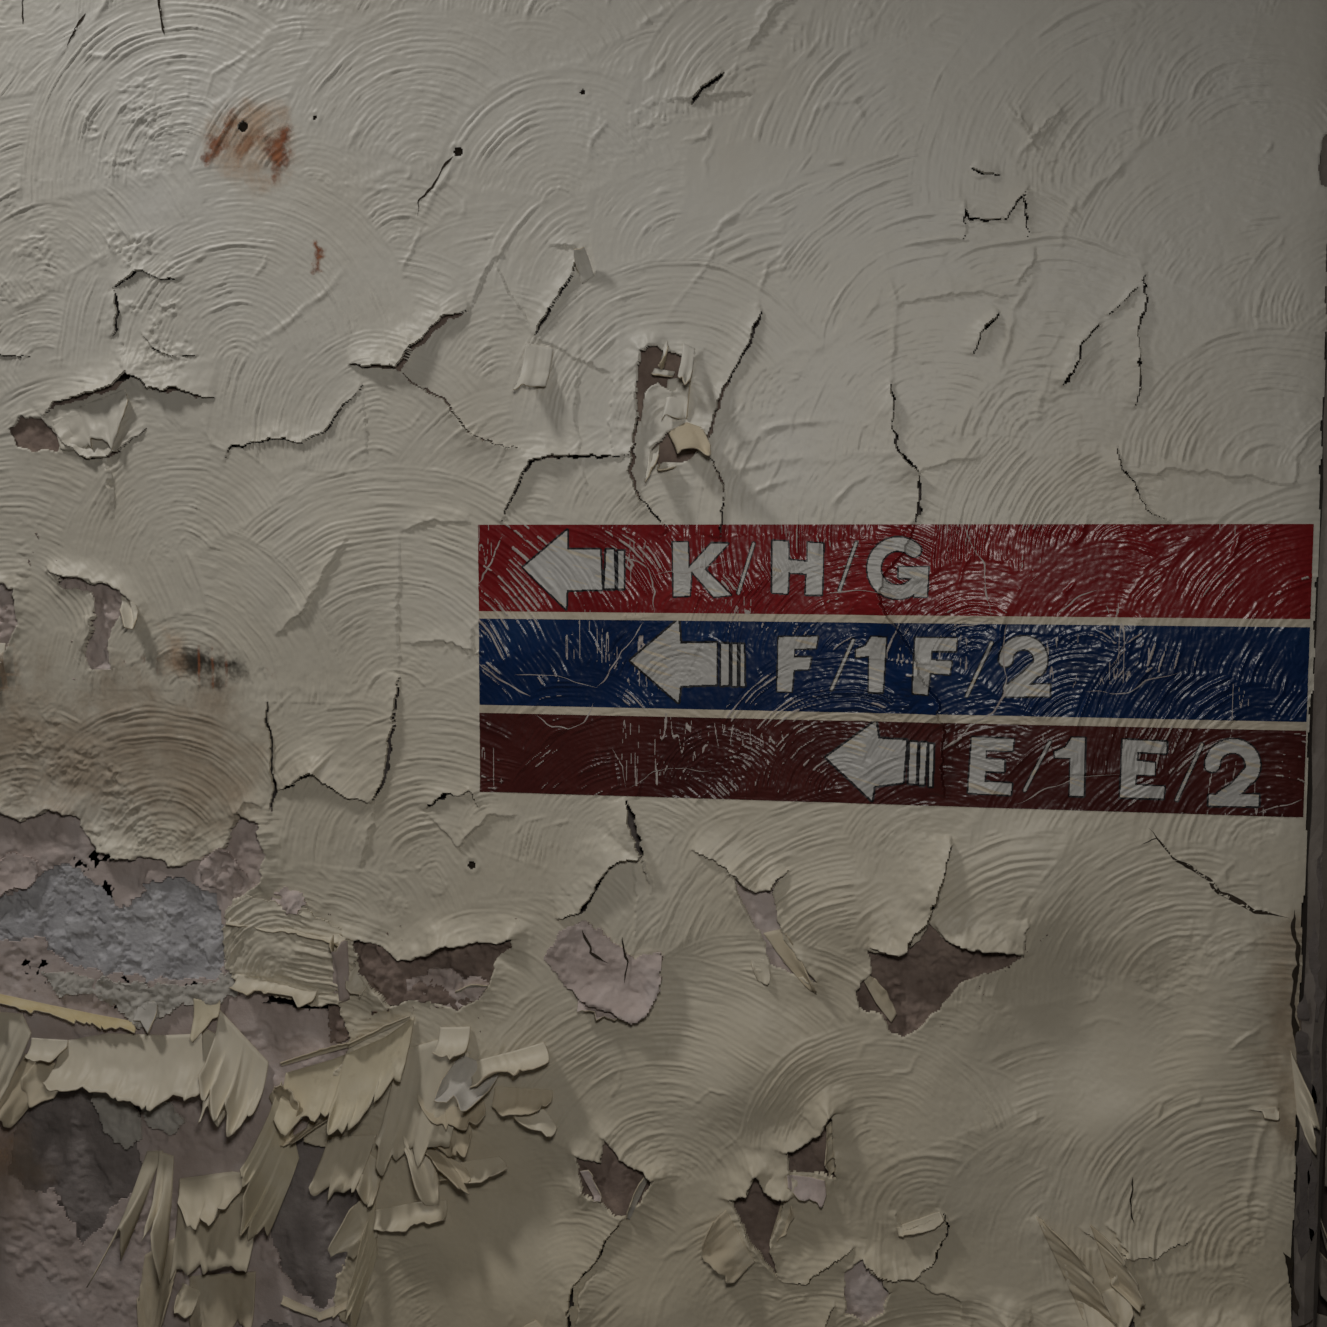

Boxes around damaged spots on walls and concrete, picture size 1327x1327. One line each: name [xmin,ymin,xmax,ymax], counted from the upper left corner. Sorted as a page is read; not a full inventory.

crack [67,13,86,45]
crack [156,0,164,33]
rust [201,112,290,177]
crack [417,157,452,215]
peeling [0,257,217,518]
peeling [220,385,368,462]
peeling [348,234,763,525]
peeling [1052,269,1148,407]
crack [477,558,723,729]
peeling [0,506,677,1327]
crack [1144,830,1301,1042]
peeling [691,831,1327,1327]